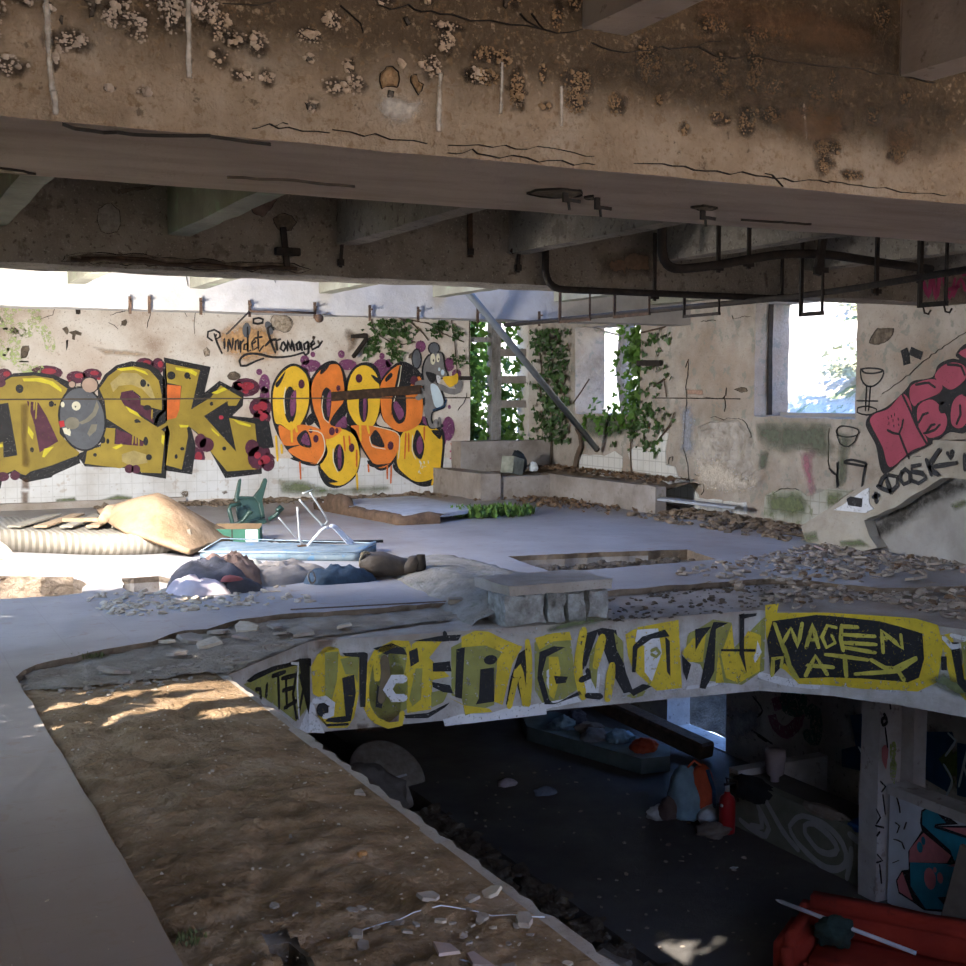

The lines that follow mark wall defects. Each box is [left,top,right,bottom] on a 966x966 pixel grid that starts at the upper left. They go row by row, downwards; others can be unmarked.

crack [340,5,364,33]
leakage [44,0,58,114]
crack [379,4,936,83]
leakage [613,21,949,148]
leakage [382,99,418,117]
crack [62,122,595,166]
crack [633,163,946,196]
spalling [61,252,311,273]